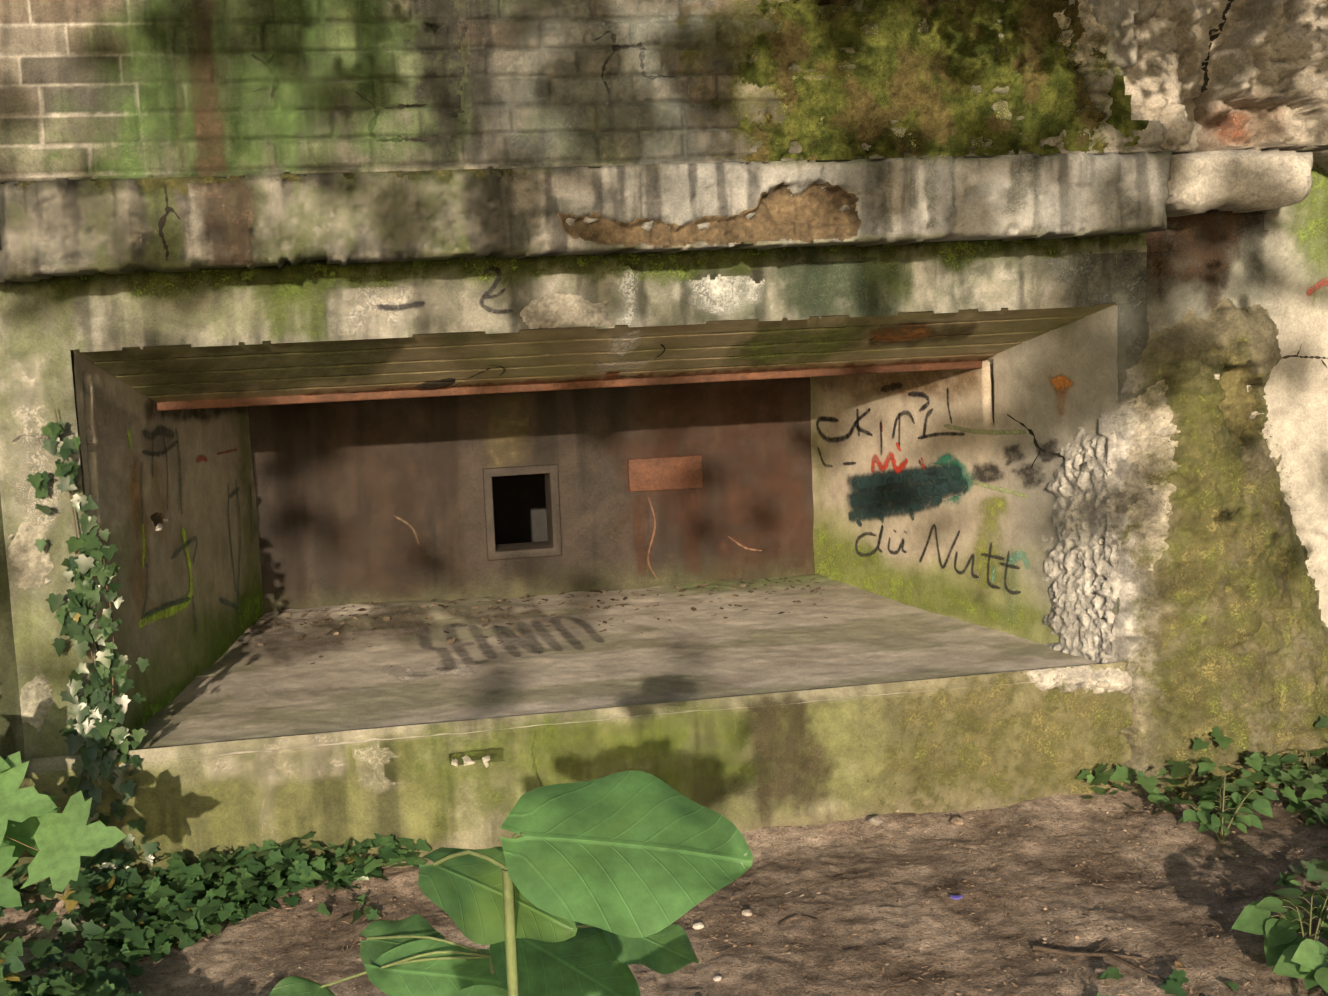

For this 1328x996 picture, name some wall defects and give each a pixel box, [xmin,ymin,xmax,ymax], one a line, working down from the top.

spalling [1053,0,1108,67]
crack [1194,0,1234,99]
spalling [1122,0,1328,173]
spalling [557,181,861,248]
corrosion [305,322,975,396]
crack [1282,344,1328,368]
crack [13,433,50,448]
spalling [1025,380,1181,694]
spalling [448,748,505,768]
crack [531,731,544,787]